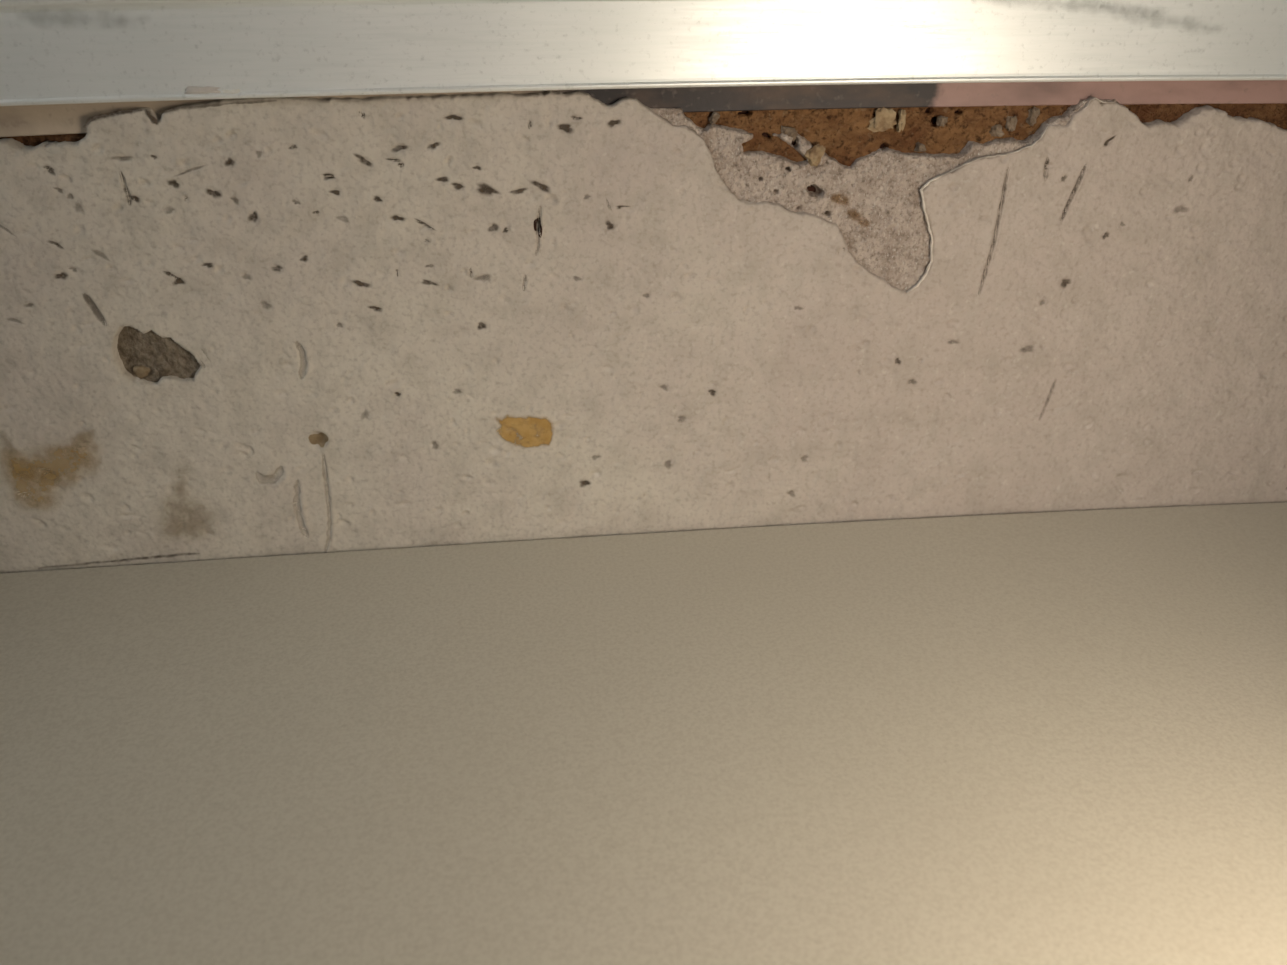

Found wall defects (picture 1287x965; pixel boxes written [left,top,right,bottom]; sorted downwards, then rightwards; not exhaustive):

spalling [650,97,1287,293]
spalling [117,326,201,382]